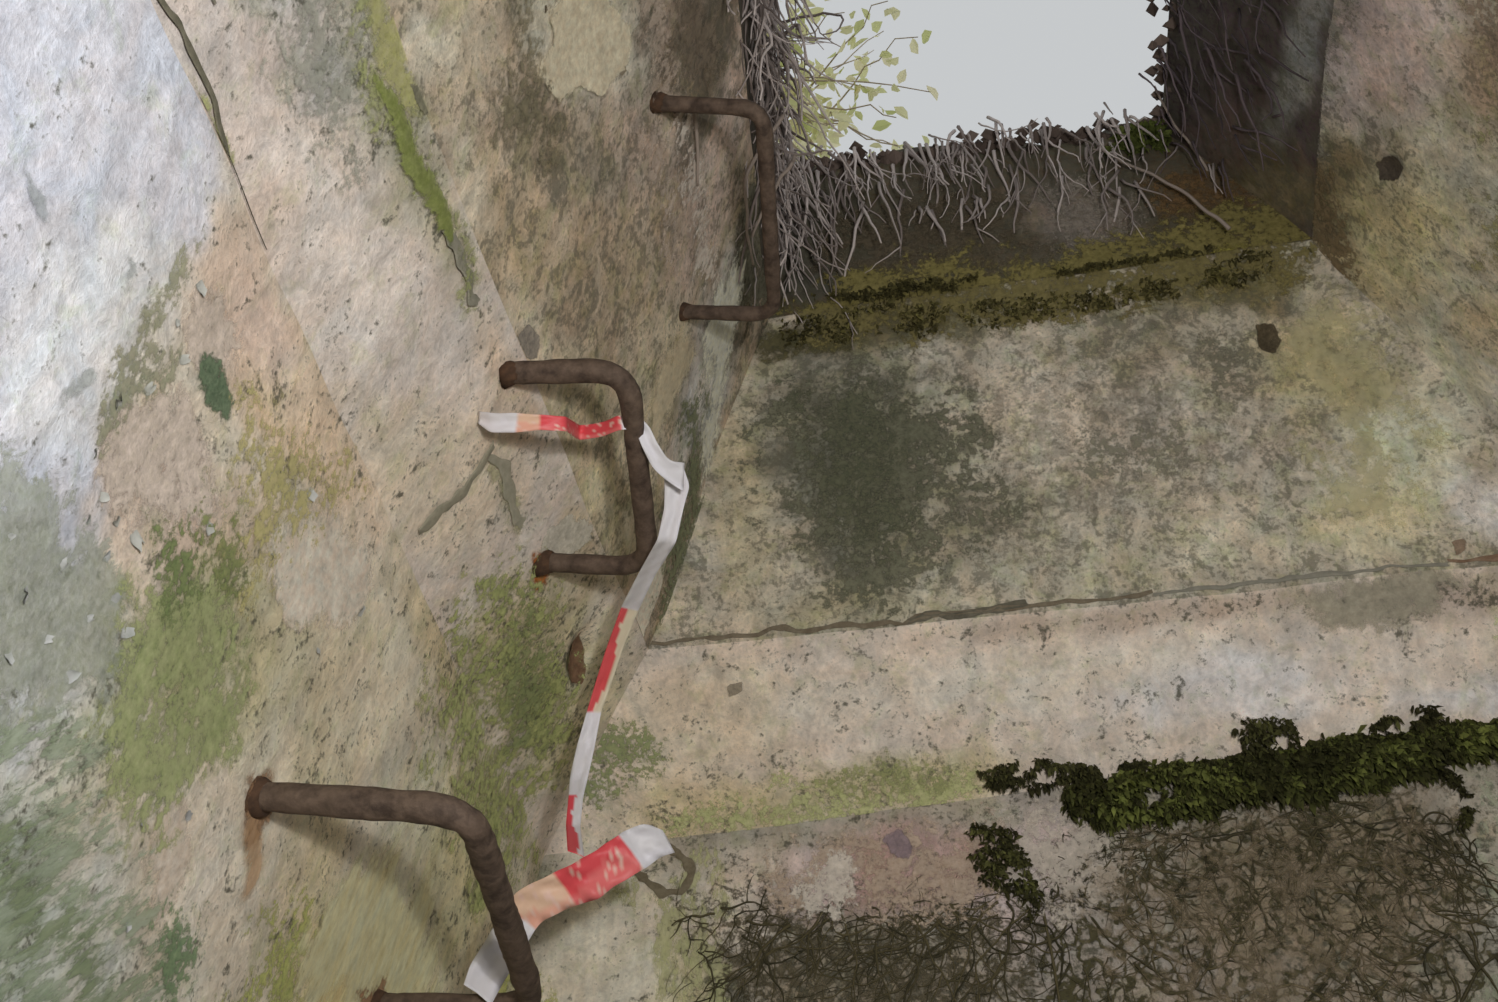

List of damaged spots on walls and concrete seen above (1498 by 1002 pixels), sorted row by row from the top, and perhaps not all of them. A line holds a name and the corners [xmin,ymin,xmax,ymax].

water stain [636,113,1042,629]
rust [244,811,272,895]